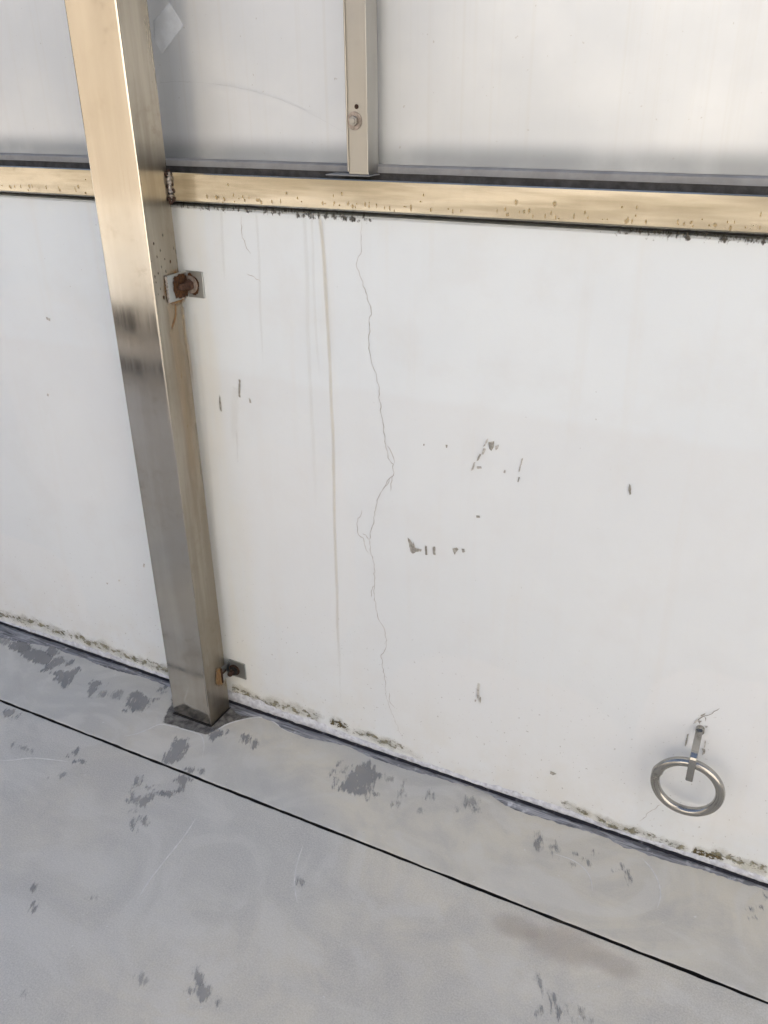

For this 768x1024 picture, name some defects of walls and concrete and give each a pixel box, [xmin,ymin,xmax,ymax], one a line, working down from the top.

damp [618,206,766,245]
rust [158,258,199,328]
crack [356,219,396,723]
peeling [471,439,499,471]
peeling [408,538,436,555]
damp [164,700,258,734]